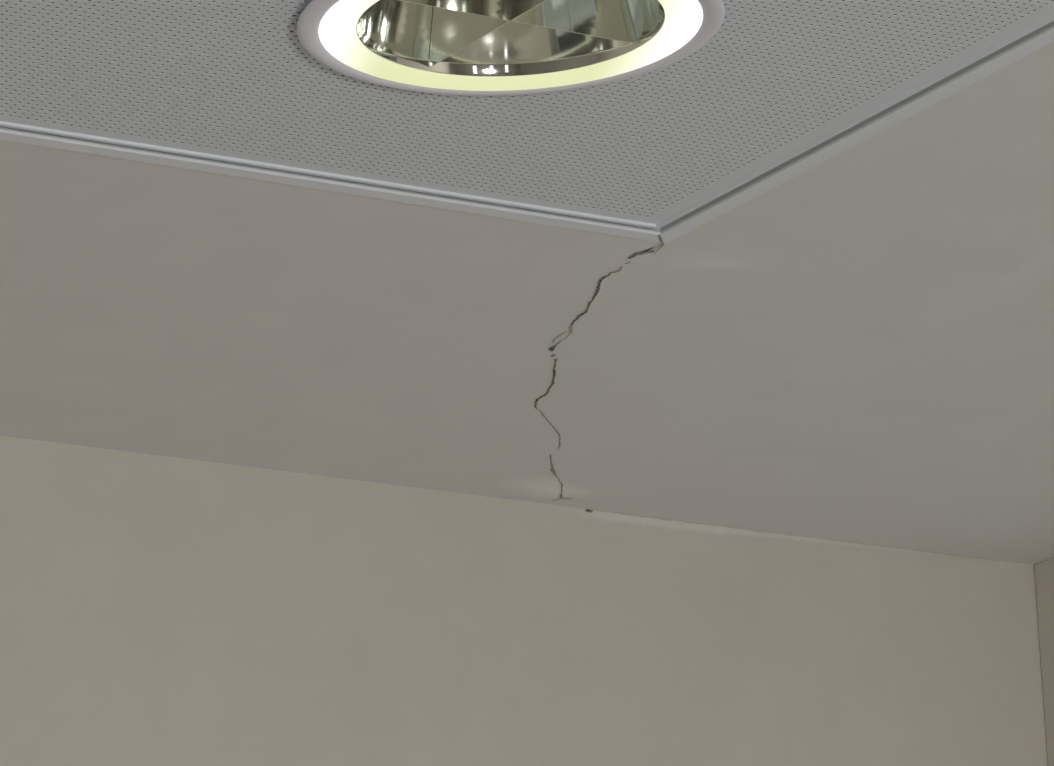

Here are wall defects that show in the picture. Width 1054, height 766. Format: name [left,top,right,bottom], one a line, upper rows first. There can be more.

crack [532,235,664,502]